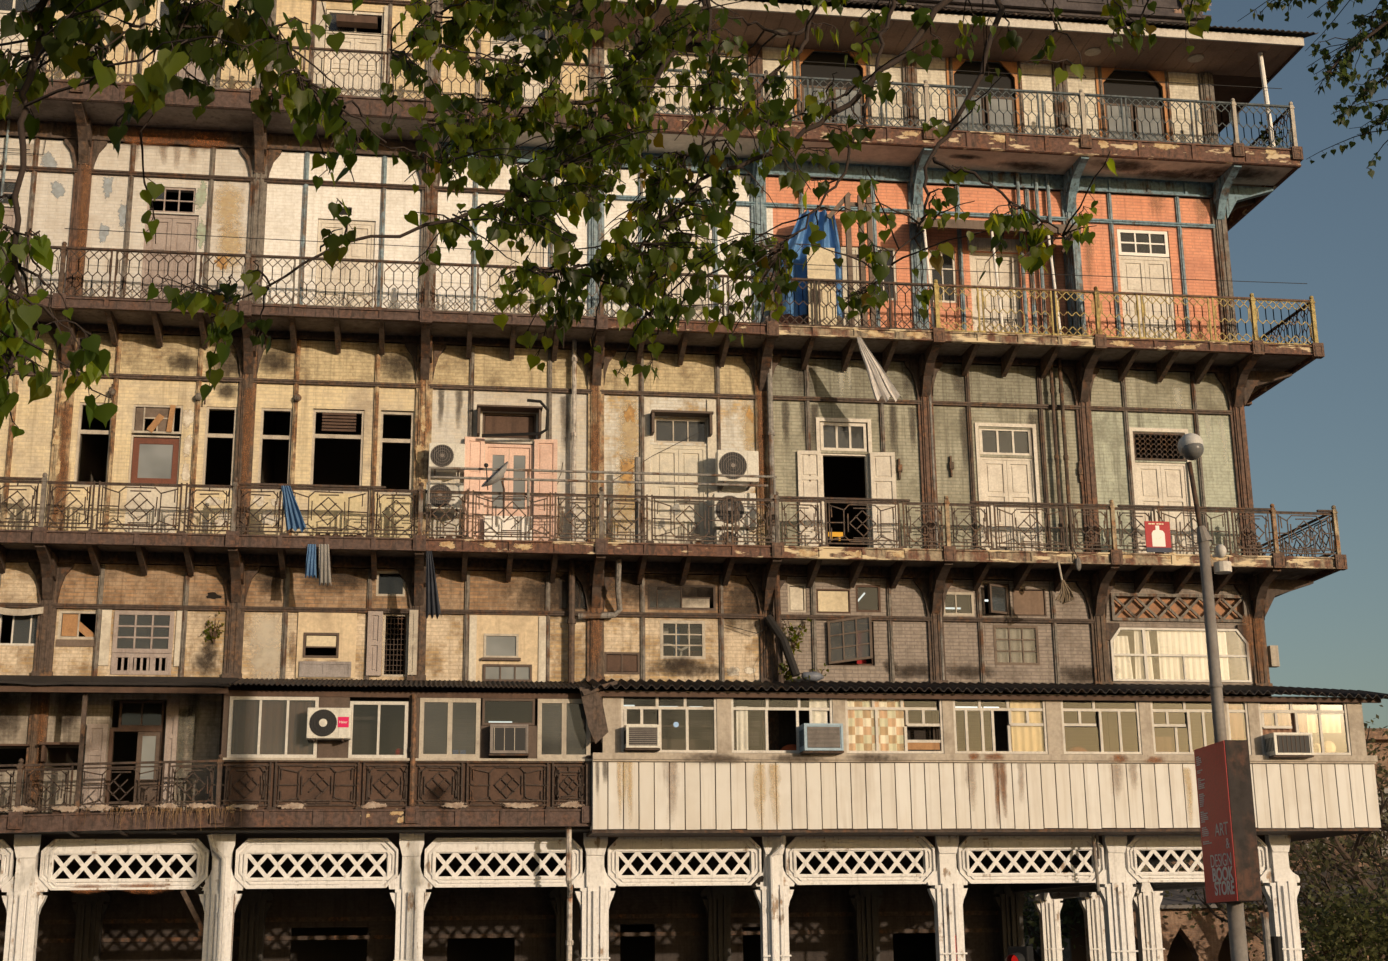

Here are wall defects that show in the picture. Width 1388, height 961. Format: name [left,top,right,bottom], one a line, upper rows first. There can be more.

peeling [799,549,819,557]
corrosion [970,754,1006,810]
peeling [0,802,258,813]
peeling [360,801,405,823]